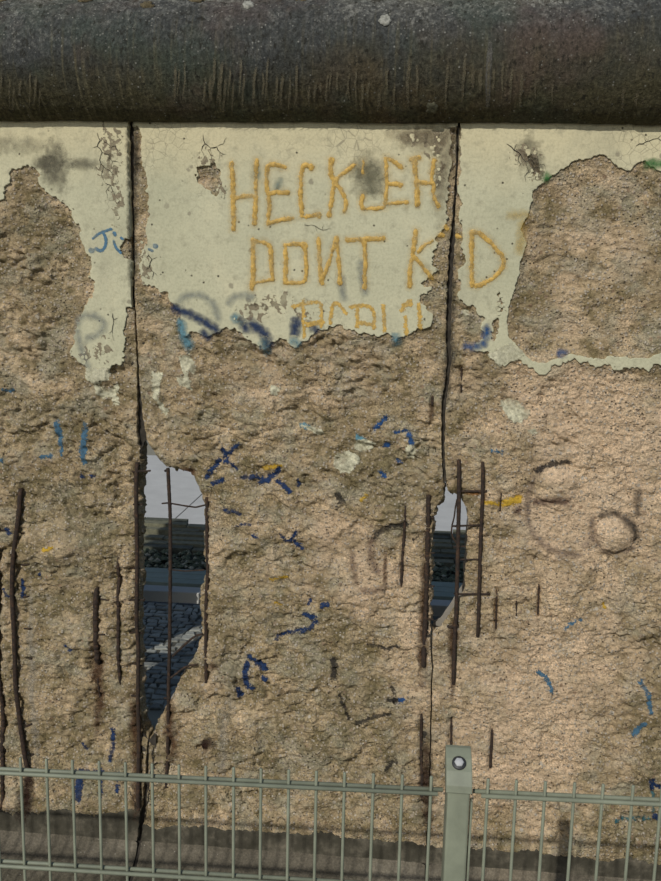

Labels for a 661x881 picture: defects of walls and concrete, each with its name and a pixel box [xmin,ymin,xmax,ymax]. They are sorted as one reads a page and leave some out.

water stain [39,153,88,181]
peeling [96,121,125,227]
crack [451,126,459,225]
spalling [0,165,151,773]
spalling [133,126,661,850]
rust [19,776,32,816]
crack [130,732,157,817]
spalling [0,775,429,846]
spalling [486,799,661,865]